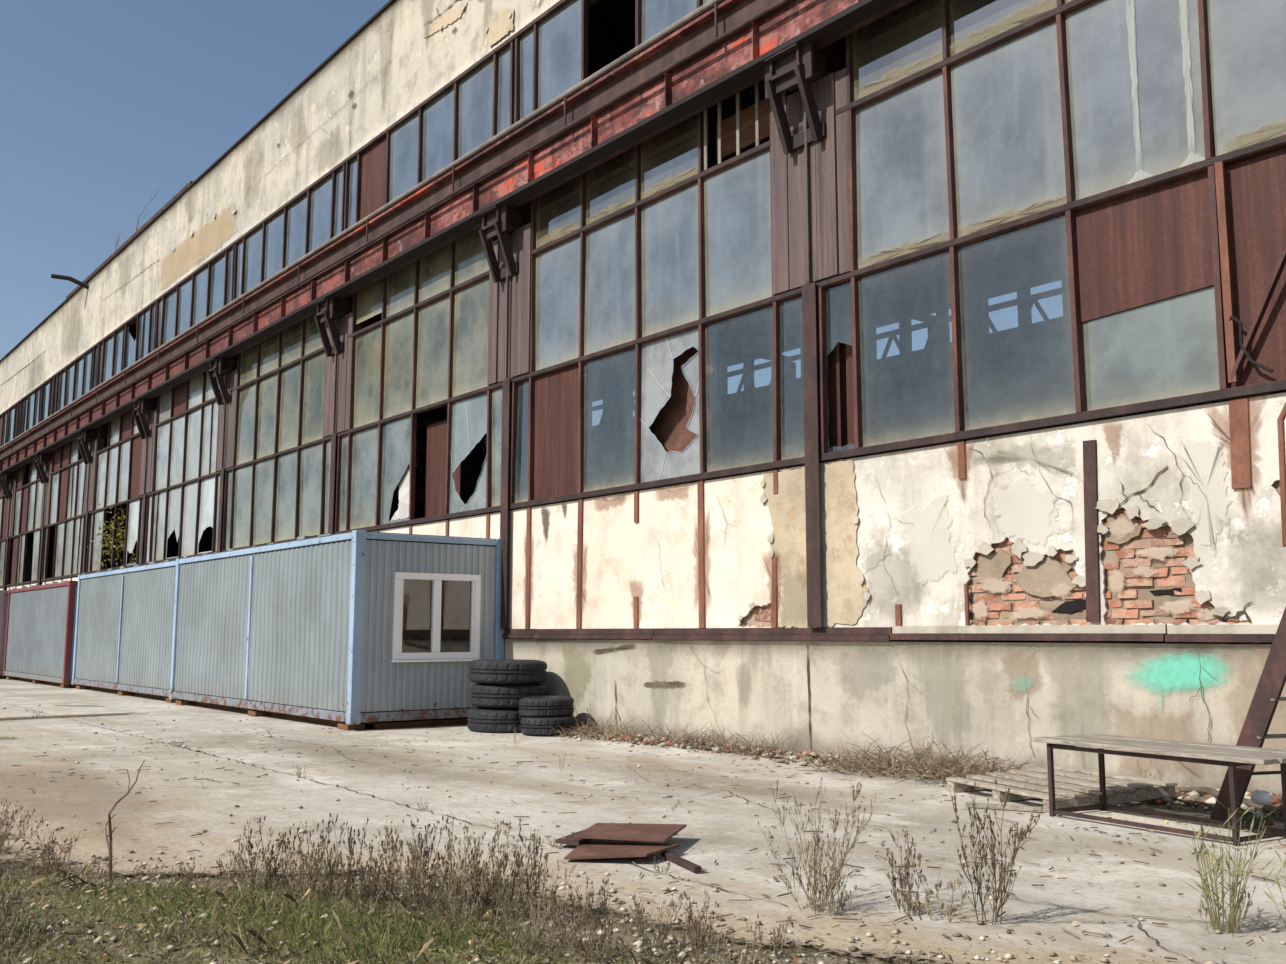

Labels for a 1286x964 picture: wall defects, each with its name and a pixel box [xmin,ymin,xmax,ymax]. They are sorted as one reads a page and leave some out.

peeling [423,2,467,38]
peeling [485,8,514,47]
peeling [161,205,236,289]
crack [970,439,1074,529]
crack [1119,424,1206,520]
flaking render [964,498,1249,626]
crack [0,701,569,865]
crack [603,858,787,906]